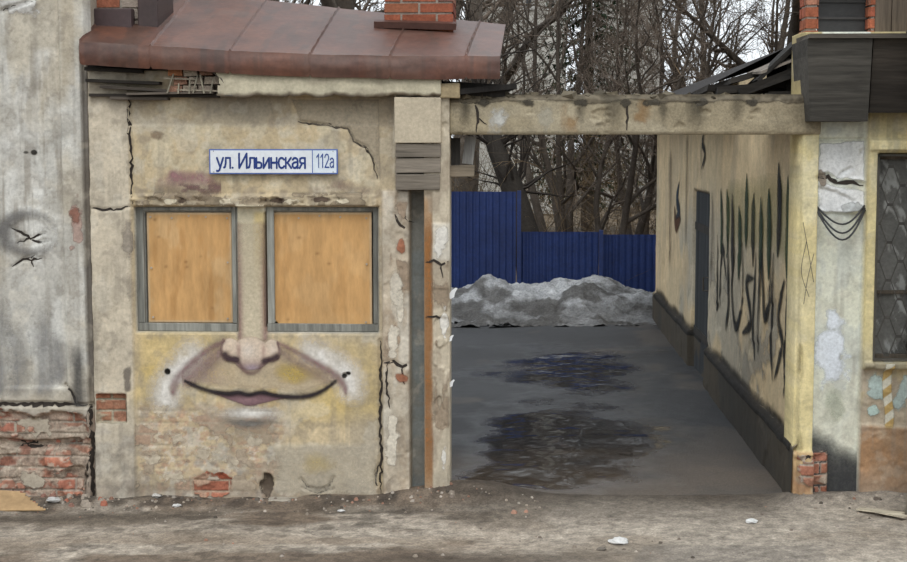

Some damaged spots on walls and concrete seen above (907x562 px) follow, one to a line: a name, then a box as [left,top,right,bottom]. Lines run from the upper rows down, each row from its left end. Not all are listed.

peeling [0,0,39,13]
crack [818,174,863,186]
crack [12,228,48,267]
peeling [433,226,448,267]
peeling [384,239,408,358]
peeling [433,283,449,345]
peeling [867,361,907,427]
spalling [0,394,277,498]
peeling [384,415,400,465]
flaking render [797,452,827,492]